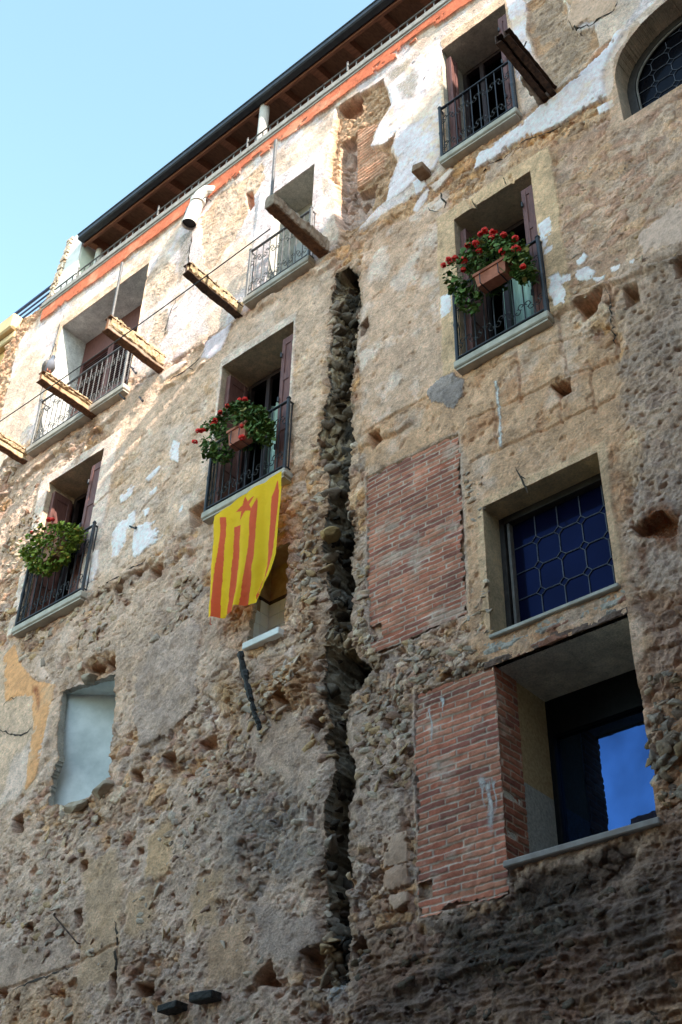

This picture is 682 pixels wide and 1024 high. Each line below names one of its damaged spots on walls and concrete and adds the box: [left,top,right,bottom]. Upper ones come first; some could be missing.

spalling [324,40,454,243]
peeling [474,0,650,169]
crack [568,2,618,37]
crack [308,267,373,989]
peeling [4,644,56,791]
efflorescence [479,778,497,824]